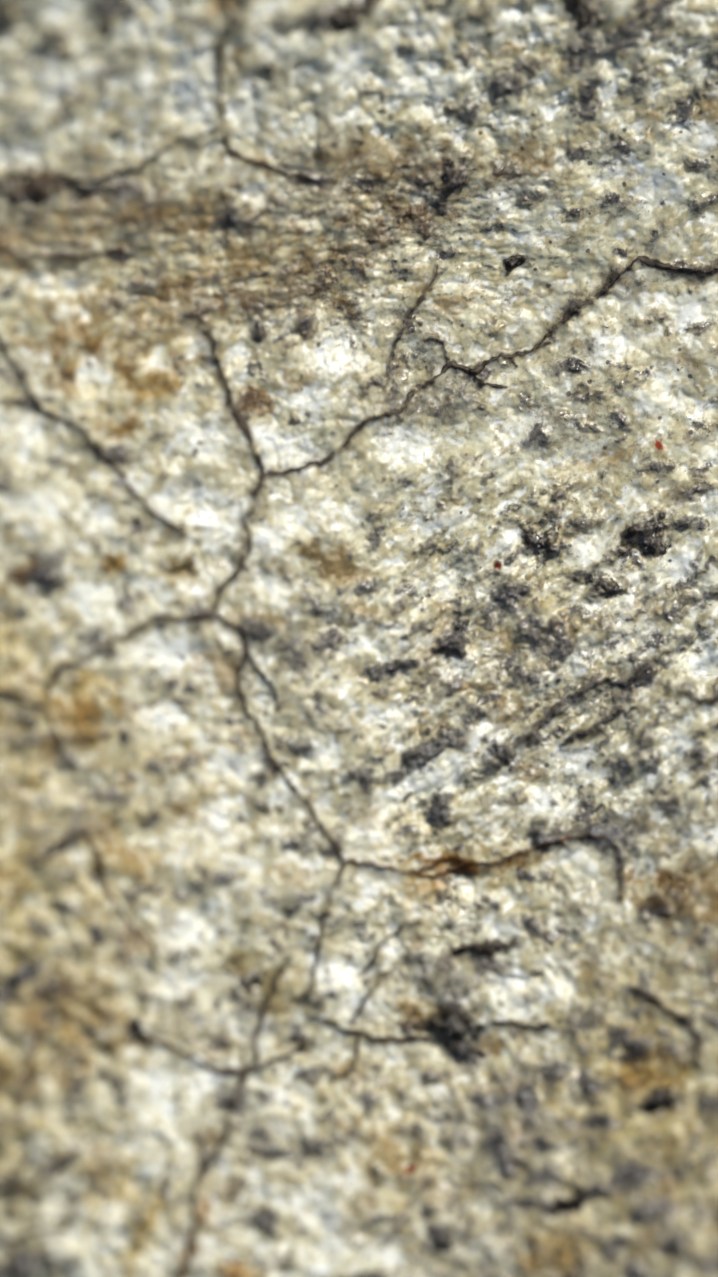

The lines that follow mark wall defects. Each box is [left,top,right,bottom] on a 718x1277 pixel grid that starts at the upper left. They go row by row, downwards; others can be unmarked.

crack [0,0,315,182]
crack [2,249,123,259]
crack [0,256,718,1277]